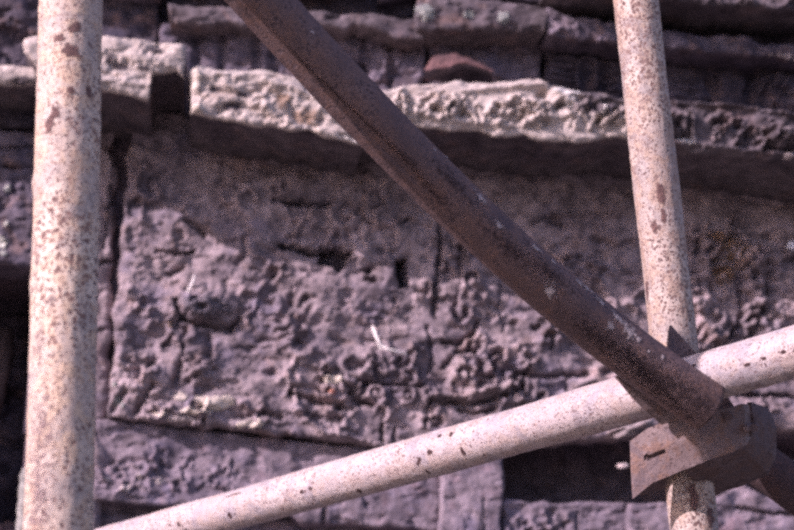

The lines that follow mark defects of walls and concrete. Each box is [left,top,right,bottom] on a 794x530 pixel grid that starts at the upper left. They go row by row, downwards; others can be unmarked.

spalling [191,68,202,93]
spalling [191,103,206,113]
spalling [313,128,358,144]